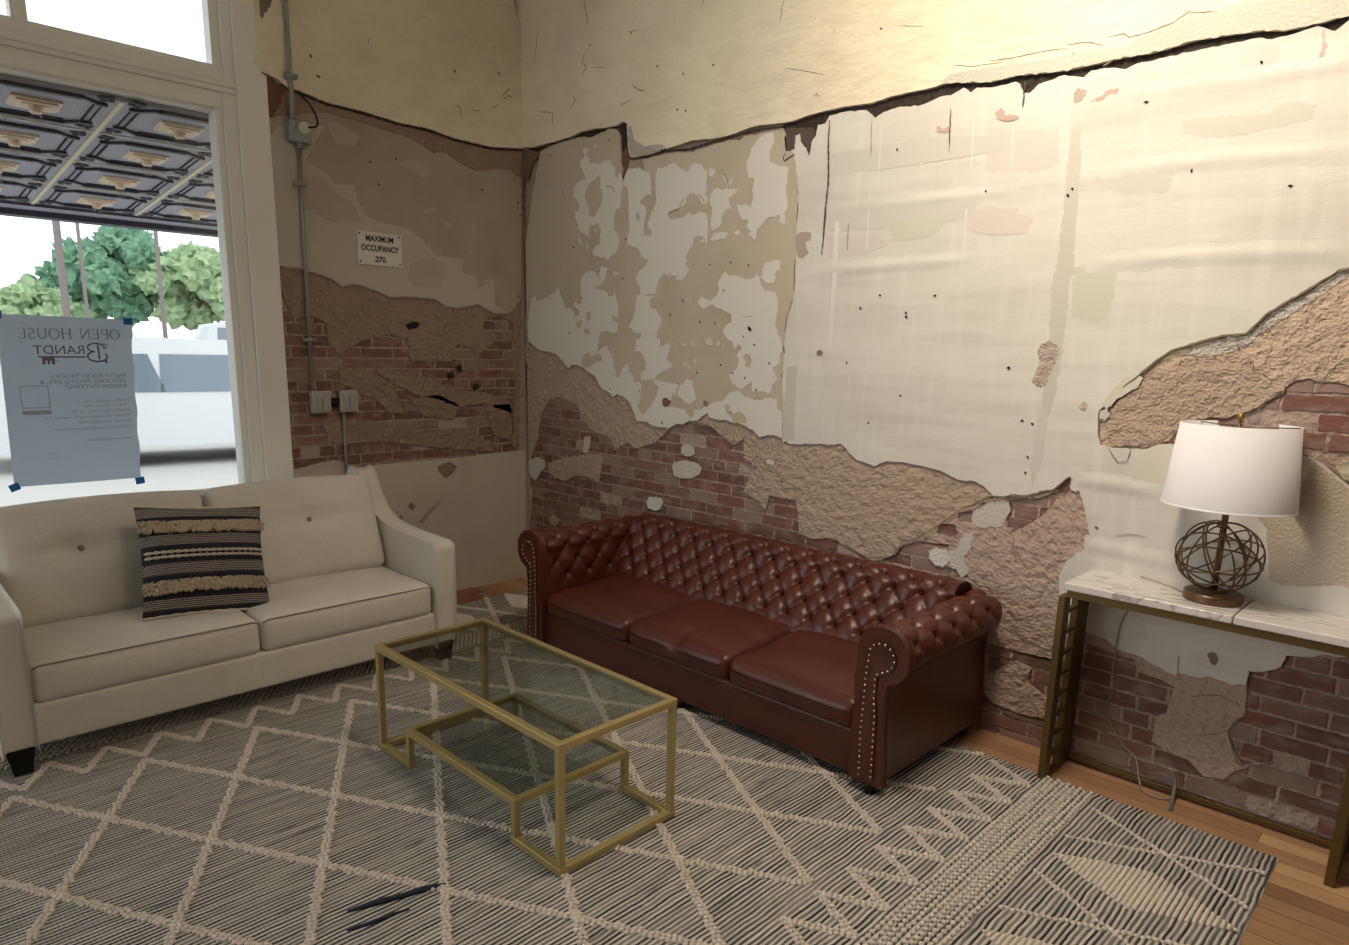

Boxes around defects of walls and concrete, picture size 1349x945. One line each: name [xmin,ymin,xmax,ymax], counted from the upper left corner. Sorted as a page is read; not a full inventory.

leakage [259,0,272,18]
crack [261,2,1349,223]
spalling [266,76,1089,748]
crack [781,259,796,378]
spalling [1079,269,1349,589]
flaking render [1070,632,1349,840]